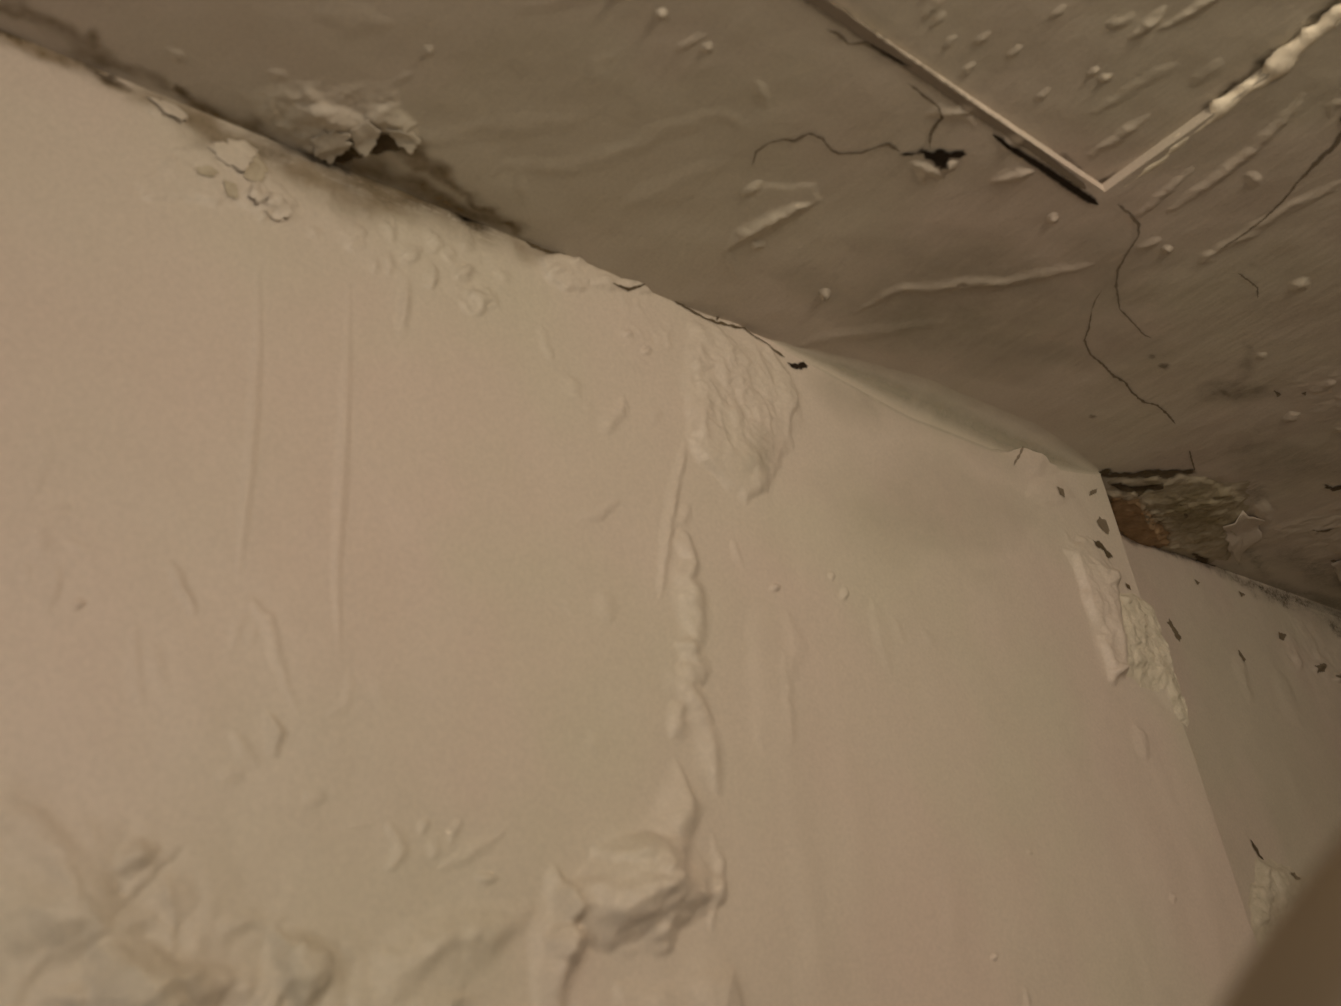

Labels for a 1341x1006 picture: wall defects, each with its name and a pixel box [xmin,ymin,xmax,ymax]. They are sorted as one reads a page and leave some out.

water stain [0,30,123,87]
water stain [176,87,272,140]
peeling [70,67,433,248]
water stain [305,147,518,232]
crack [992,134,1174,422]
peeling [992,448,1265,728]
peeling [1248,857,1306,943]